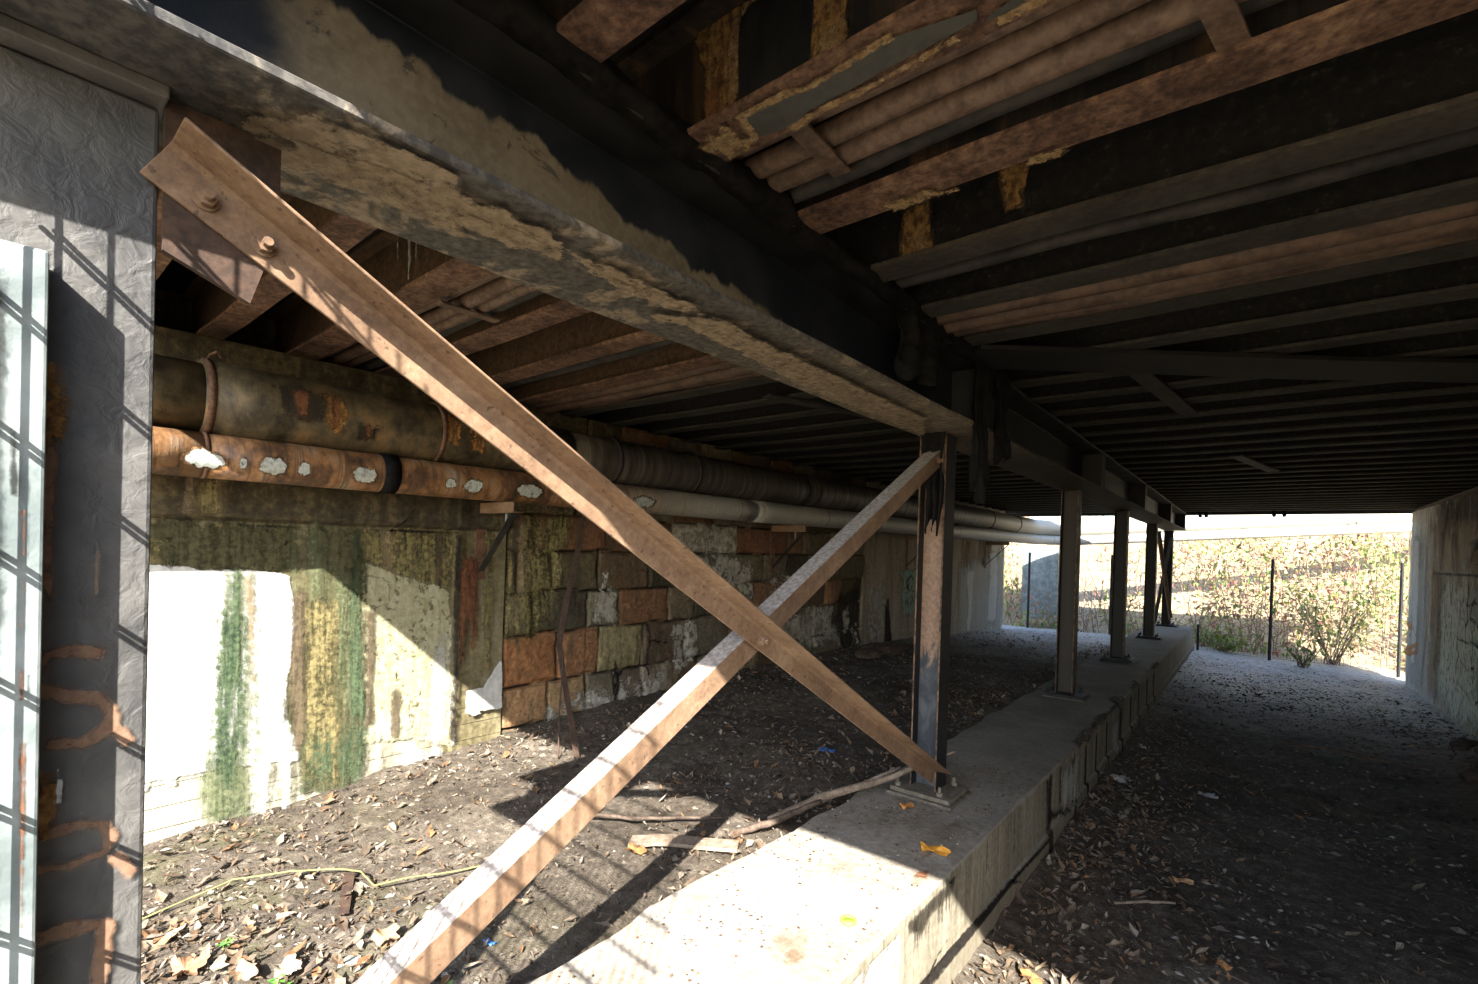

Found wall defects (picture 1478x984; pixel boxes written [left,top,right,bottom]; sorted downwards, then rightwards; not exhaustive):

peeling [695,0,1047,160]
peeling [240,112,928,435]
peeling [883,188,959,256]
peeling [999,146,1065,211]
corrosion [447,414,486,453]
damp [150,517,459,822]
damp [853,852,955,984]